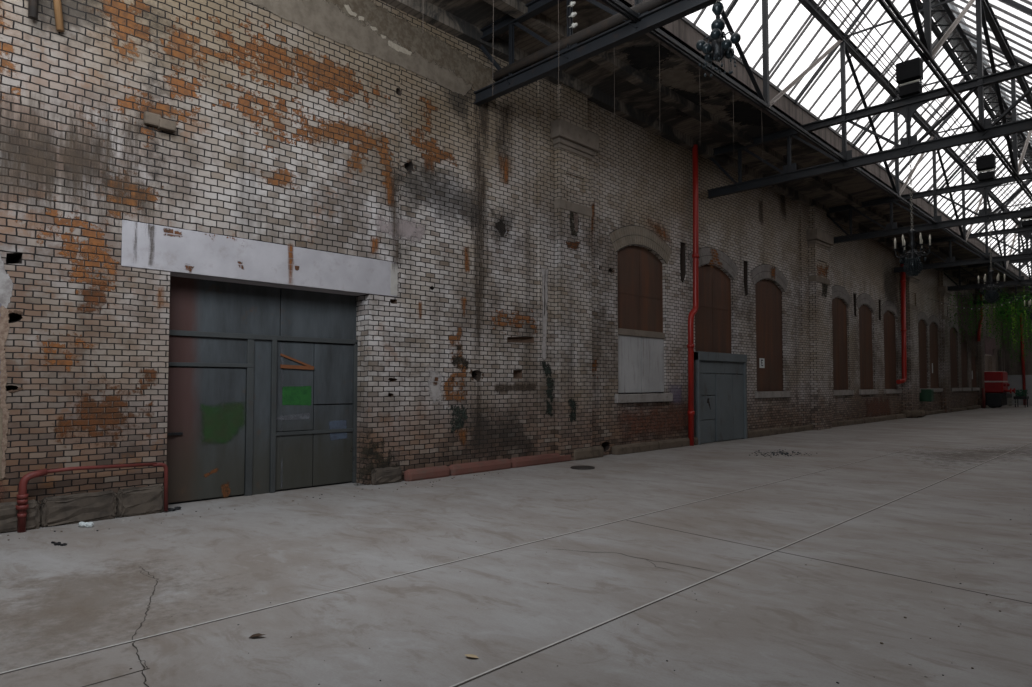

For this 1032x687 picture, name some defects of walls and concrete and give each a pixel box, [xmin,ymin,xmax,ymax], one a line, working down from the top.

spalling [0,42,15,73]
spalling [78,0,457,205]
spalling [37,170,163,313]
water stain [461,102,511,349]
flaking render [0,253,23,480]
spalling [47,377,154,448]
spalling [469,369,484,381]
crack [132,566,158,687]